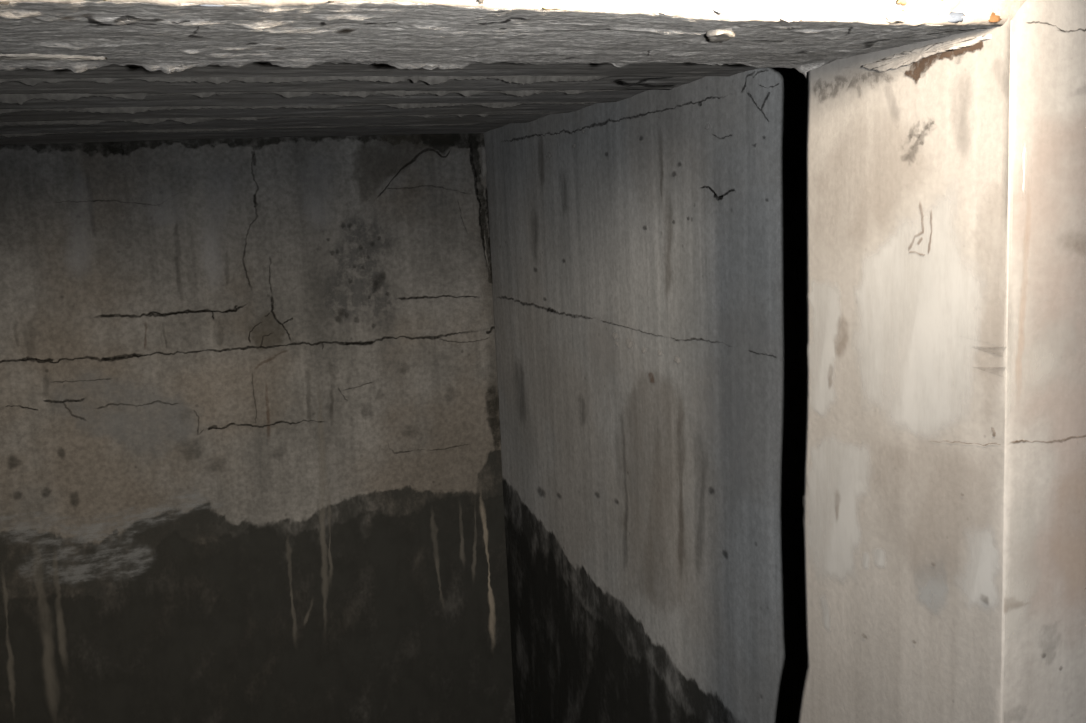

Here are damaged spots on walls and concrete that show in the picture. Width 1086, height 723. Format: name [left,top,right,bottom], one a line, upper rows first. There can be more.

crack [848,27,987,46]
crack [400,293,476,301]
crack [0,298,461,363]
crack [7,400,80,410]
crack [208,420,322,430]
leakage [0,389,732,723]